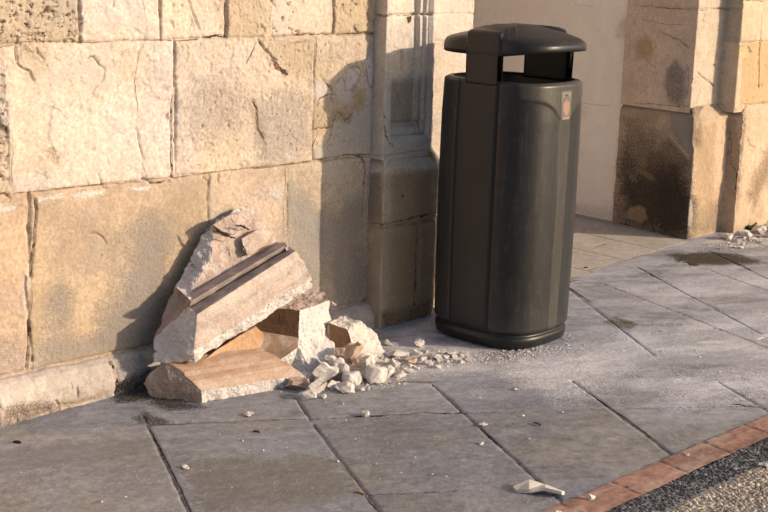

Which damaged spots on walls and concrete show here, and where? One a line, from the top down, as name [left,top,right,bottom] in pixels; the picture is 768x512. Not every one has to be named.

spalling [180,49,374,167]
crack [0,1,428,368]
damp [667,251,765,266]